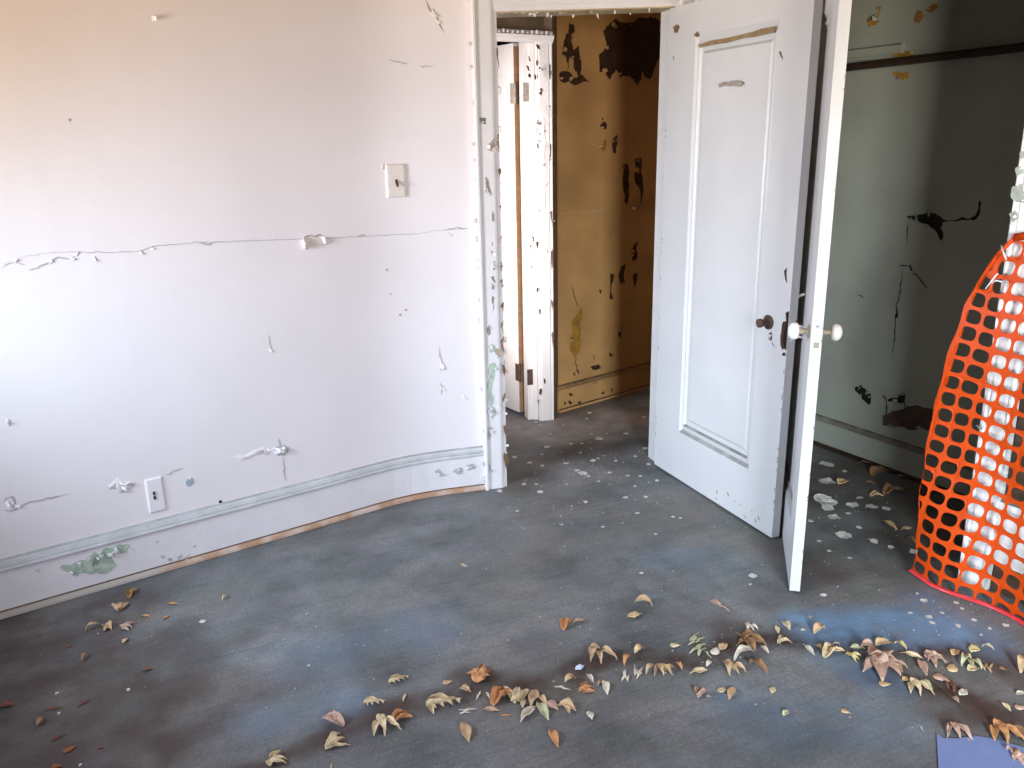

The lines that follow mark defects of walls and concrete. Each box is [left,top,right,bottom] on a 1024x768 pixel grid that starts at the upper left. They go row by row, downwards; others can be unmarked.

peeling [498,8,674,95]
peeling [472,126,503,162]
peeling [598,118,619,153]
peeling [621,158,644,205]
flaking render [906,200,981,247]
crack [5,227,467,271]
peeling [599,242,638,299]
peeling [569,307,583,357]
crack [892,265,928,357]
peeling [481,302,509,469]
peeling [855,385,935,431]
peeling [60,544,129,577]